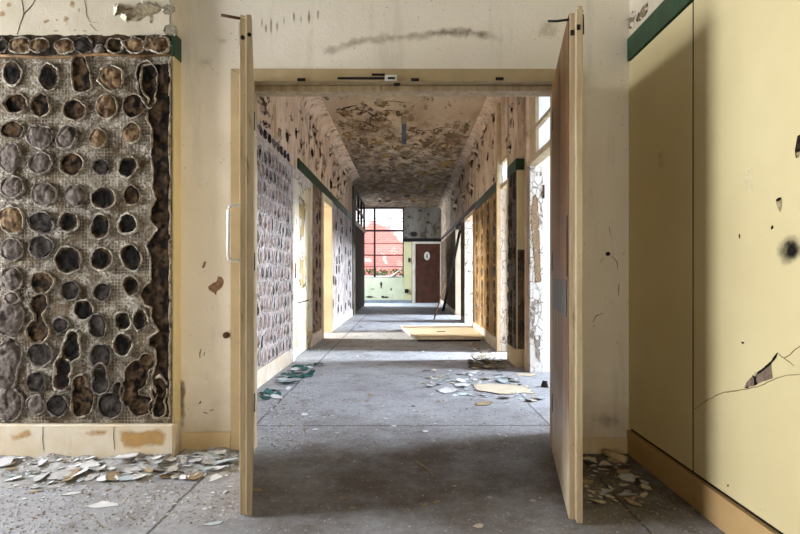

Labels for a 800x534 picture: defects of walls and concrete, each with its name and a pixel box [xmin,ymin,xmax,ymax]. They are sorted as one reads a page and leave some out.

peeling [0,34,157,56]
peeling [114,1,178,54]
peeling [336,101,495,211]
peeling [208,276,224,295]
crack [695,346,800,409]